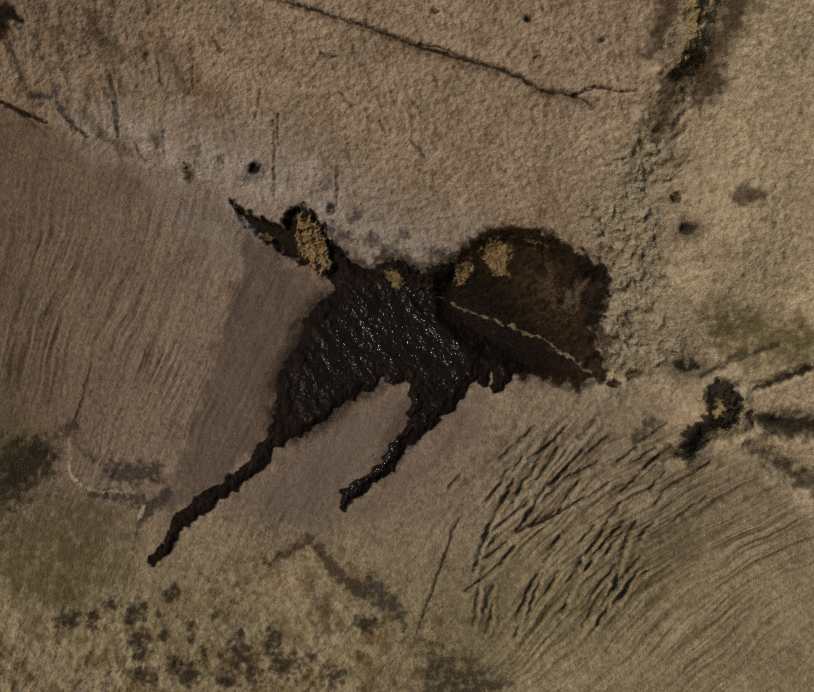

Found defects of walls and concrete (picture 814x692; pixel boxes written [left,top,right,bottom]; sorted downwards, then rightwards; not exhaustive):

crack [284,2,635,105]
damp [664,0,719,73]
crack [0,100,48,126]
spalling [228,198,336,277]
damp [30,83,530,567]
spalling [440,223,621,393]
damp [0,436,58,510]
crack [409,518,459,640]